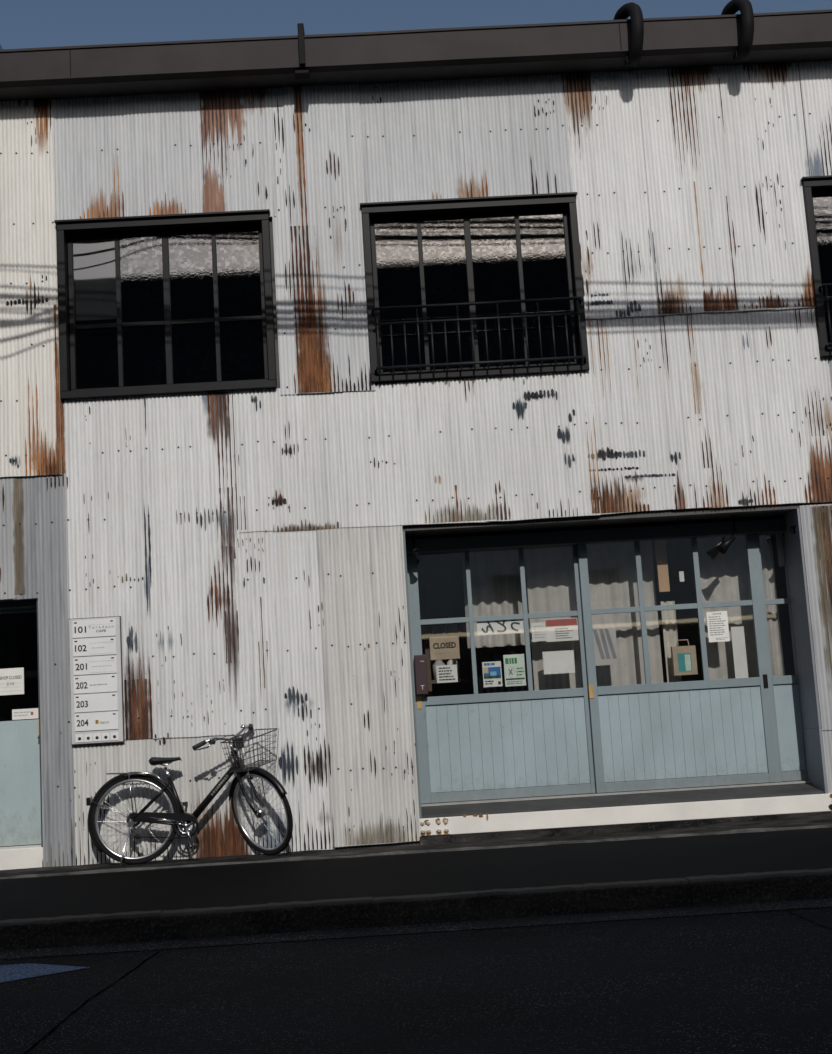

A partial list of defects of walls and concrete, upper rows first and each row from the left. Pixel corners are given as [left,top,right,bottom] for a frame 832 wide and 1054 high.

corrosion [200,88,266,213]
corrosion [562,72,592,148]
corrosion [668,66,724,170]
corrosion [285,86,332,393]
corrosion [656,181,817,375]
corrosion [25,305,66,487]
corrosion [587,417,650,514]
corrosion [802,392,832,503]
corrosion [202,392,239,692]
corrosion [124,626,153,740]
corrosion [191,797,248,858]
crack [23,951,159,1054]